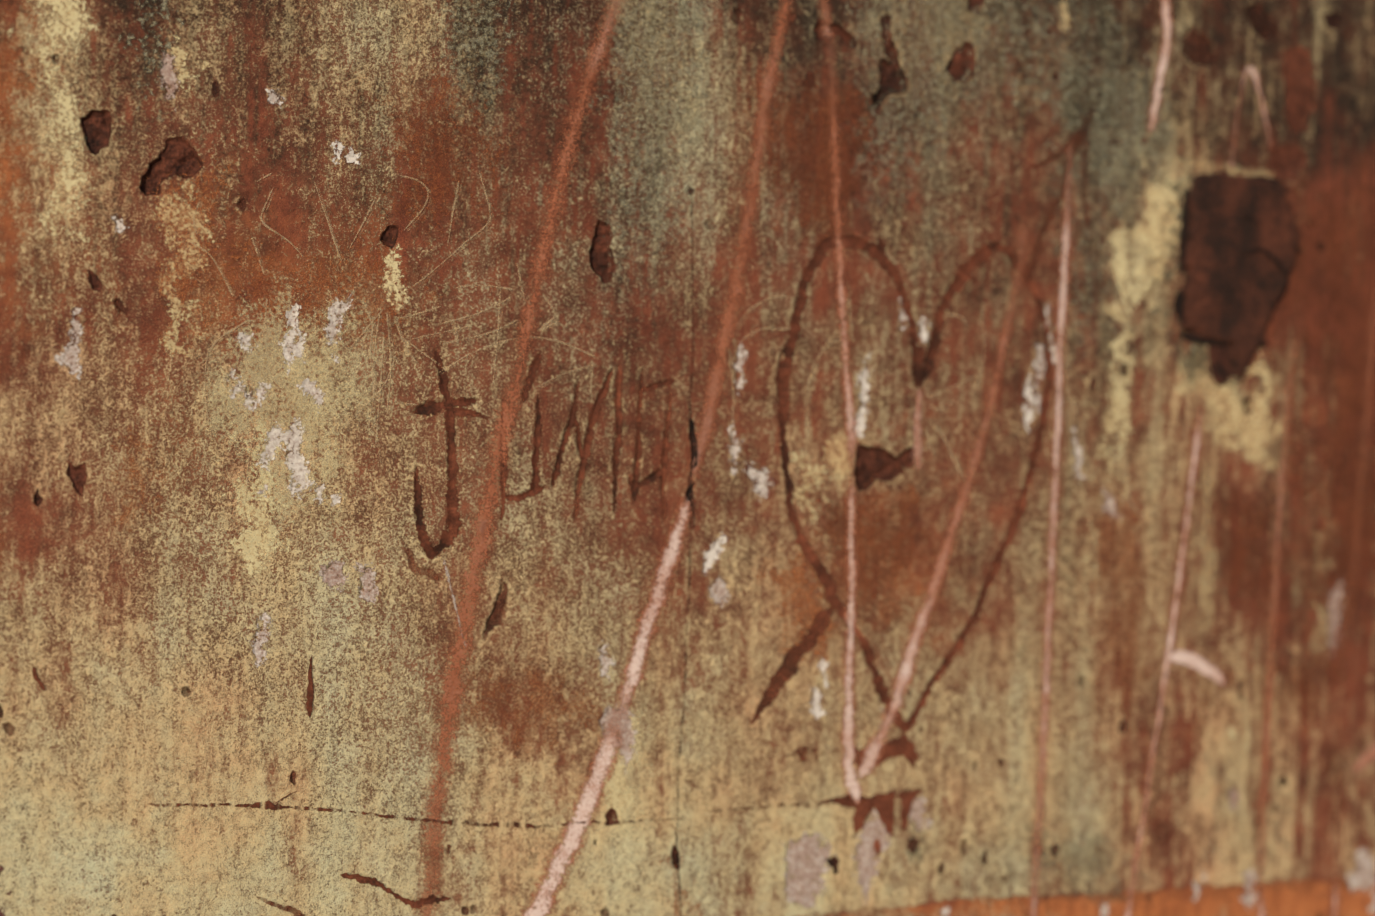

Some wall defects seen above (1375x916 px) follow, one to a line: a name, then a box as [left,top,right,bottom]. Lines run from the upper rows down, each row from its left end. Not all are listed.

spalling [80,110,112,155]
spalling [140,136,203,196]
spalling [854,352,915,491]
peeling [854,726,923,770]
peeling [782,790,933,910]